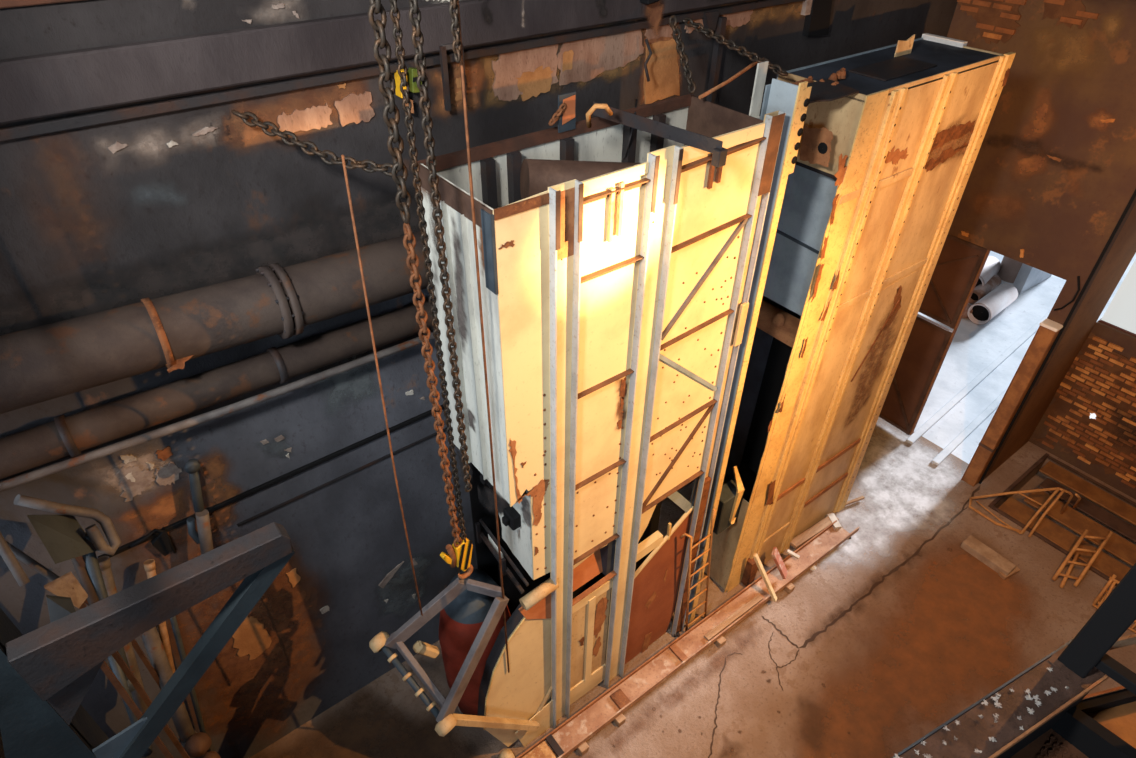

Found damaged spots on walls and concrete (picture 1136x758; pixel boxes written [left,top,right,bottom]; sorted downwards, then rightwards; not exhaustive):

flaking render [721,2,803,30]
spalling [957,0,1027,44]
flaking render [435,19,704,113]
peeling [108,140,178,154]
flaking render [192,80,375,146]
peeling [98,446,223,570]
spalling [168,578,245,657]
spalling [189,557,330,733]
crack [708,485,981,758]